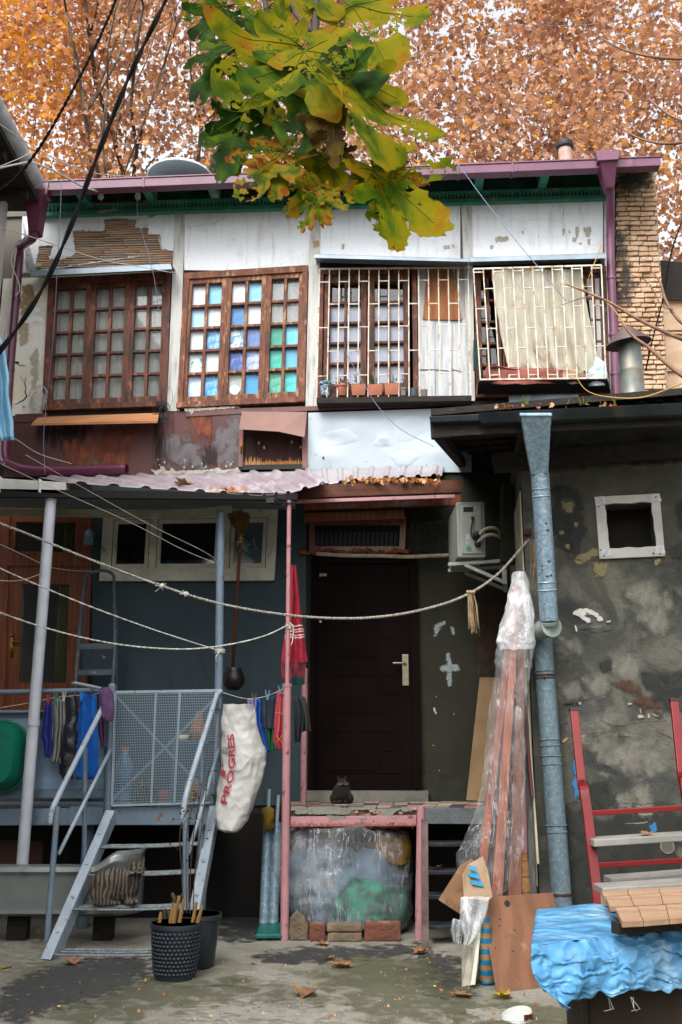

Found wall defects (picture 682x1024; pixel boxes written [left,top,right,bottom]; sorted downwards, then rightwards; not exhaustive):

spalling [35,209,173,268]
peeling [562,226,591,245]
rust [61,435,130,466]
rust [158,414,241,471]
damp [550,485,608,577]
damp [558,608,611,652]
damp [626,581,670,632]
damp [560,655,682,712]